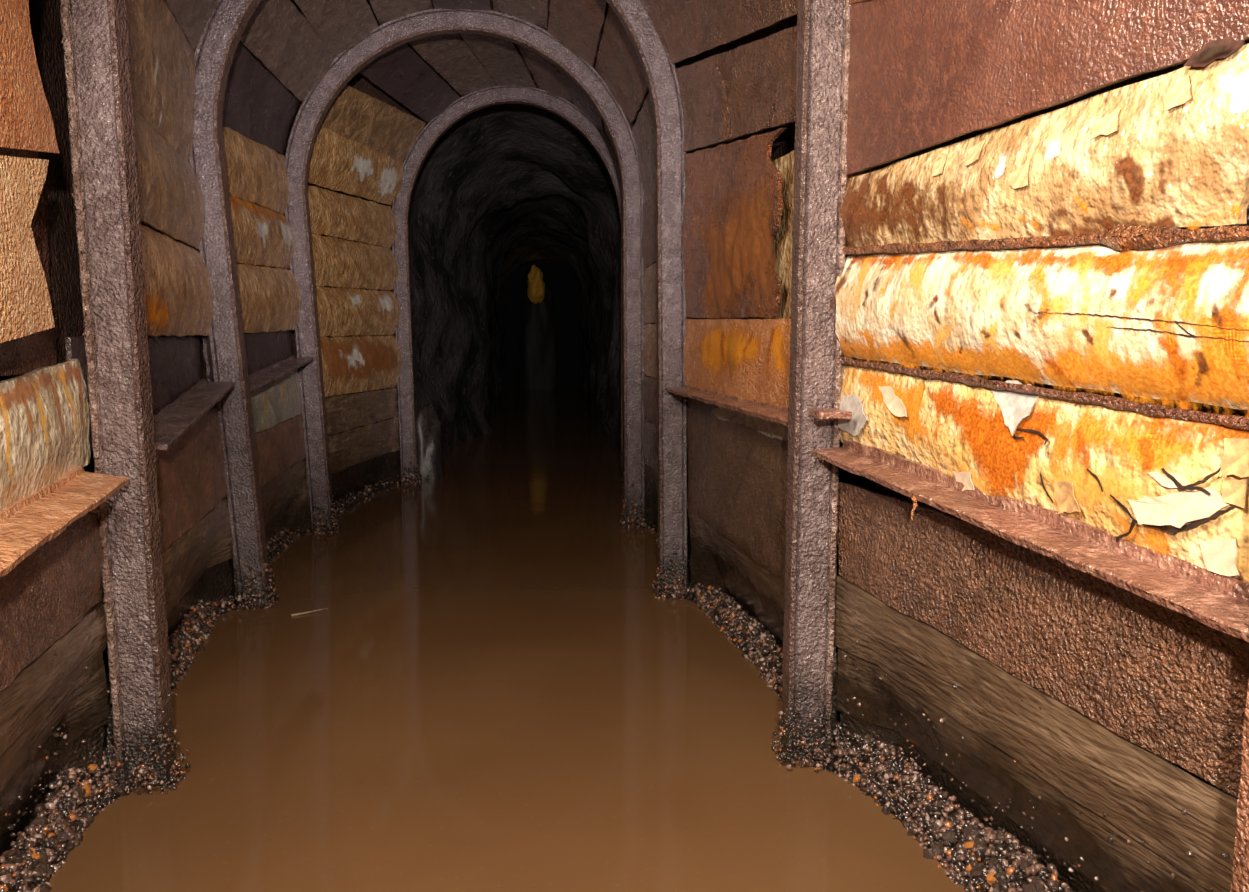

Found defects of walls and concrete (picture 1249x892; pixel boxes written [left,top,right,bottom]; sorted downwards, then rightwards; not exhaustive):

water stain [1220,70,1249,113]
water stain [351,156,397,196]
water stain [995,156,1005,178]
corrosion [1115,156,1170,204]
corrosion [831,172,1249,556]
peeling [878,386,907,417]
peeling [991,380,1039,436]
crack [1008,427,1049,444]
crack [1040,474,1053,503]
crack [1086,468,1236,543]
peeling [1128,438,1249,528]
peeling [1199,539,1240,576]